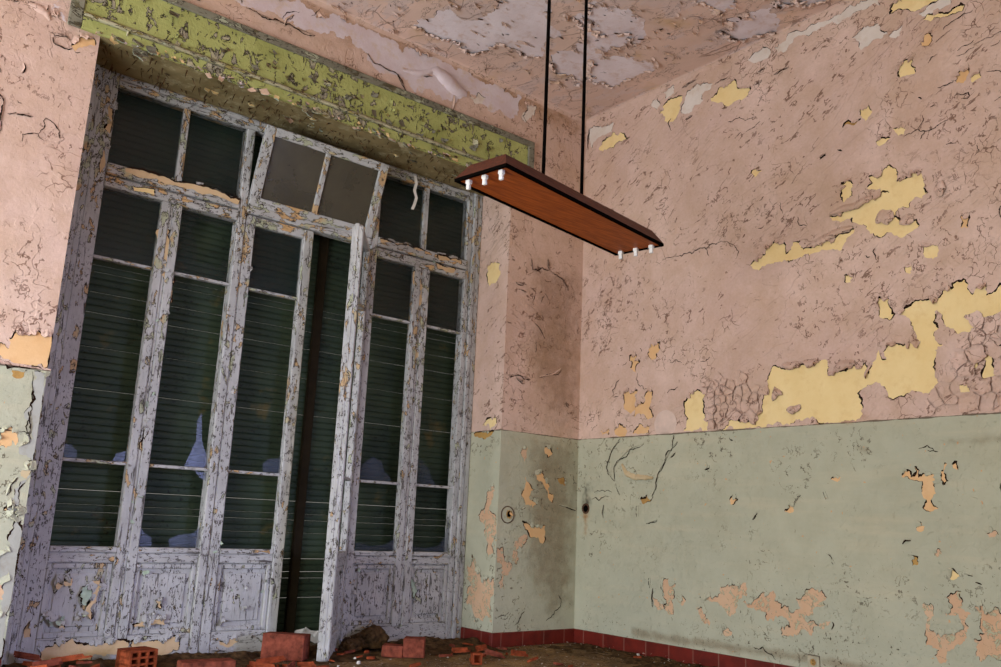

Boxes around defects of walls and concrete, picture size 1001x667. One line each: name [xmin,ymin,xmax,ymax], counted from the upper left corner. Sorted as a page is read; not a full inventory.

crack [0,63,60,141]
crack [14,0,80,53]
flaking render [235,0,965,123]
peeling [751,164,928,270]
crack [0,361,44,440]
peeling [683,278,1001,431]
crack [923,310,1001,416]
crack [4,476,18,496]
crack [559,435,677,524]
peeling [466,483,546,623]
peeling [698,580,830,637]
peeling [922,567,1001,664]